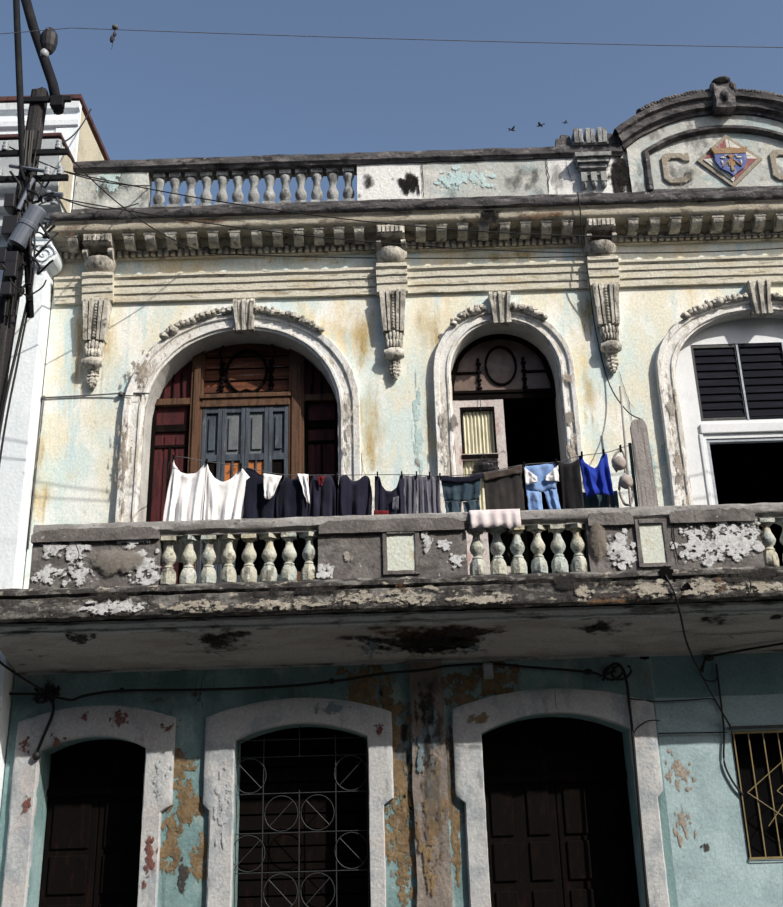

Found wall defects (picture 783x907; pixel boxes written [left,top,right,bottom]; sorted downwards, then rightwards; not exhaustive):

leakage [398,172,420,196]
peeling [31,542,95,587]
peeling [116,539,161,585]
peeling [606,528,638,571]
peeling [626,521,783,598]
flaking render [77,598,149,615]
leakage [189,628,251,653]
leakage [337,626,505,656]
peeling [314,661,520,907]
peeling [665,748,696,793]
peeling [143,748,232,893]
peeling [673,807,710,852]